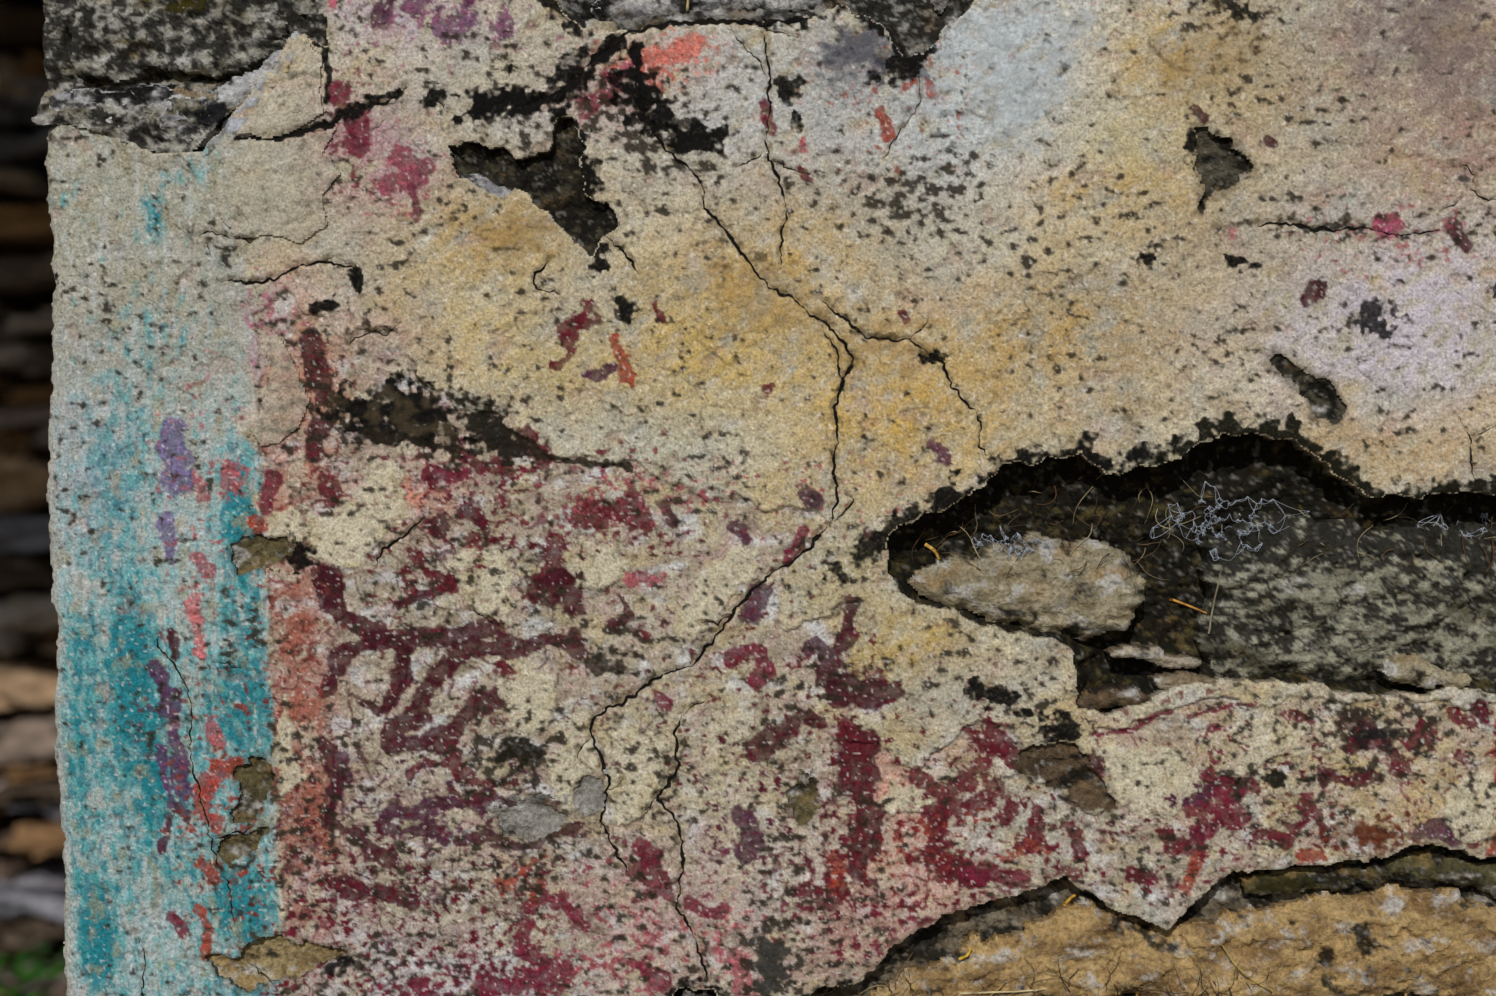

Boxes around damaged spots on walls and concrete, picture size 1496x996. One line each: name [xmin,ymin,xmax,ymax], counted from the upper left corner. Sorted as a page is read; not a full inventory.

spalling [558,0,973,57]
flaking render [32,0,340,243]
spalling [449,118,618,256]
spalling [1194,127,1253,213]
crack [1258,165,1496,236]
crack [531,16,986,980]
crack [1457,415,1494,481]
spalling [887,432,1496,714]
spalling [208,756,280,866]
spalling [1016,741,1115,812]
spalling [810,857,1106,996]
spalling [1176,844,1496,922]